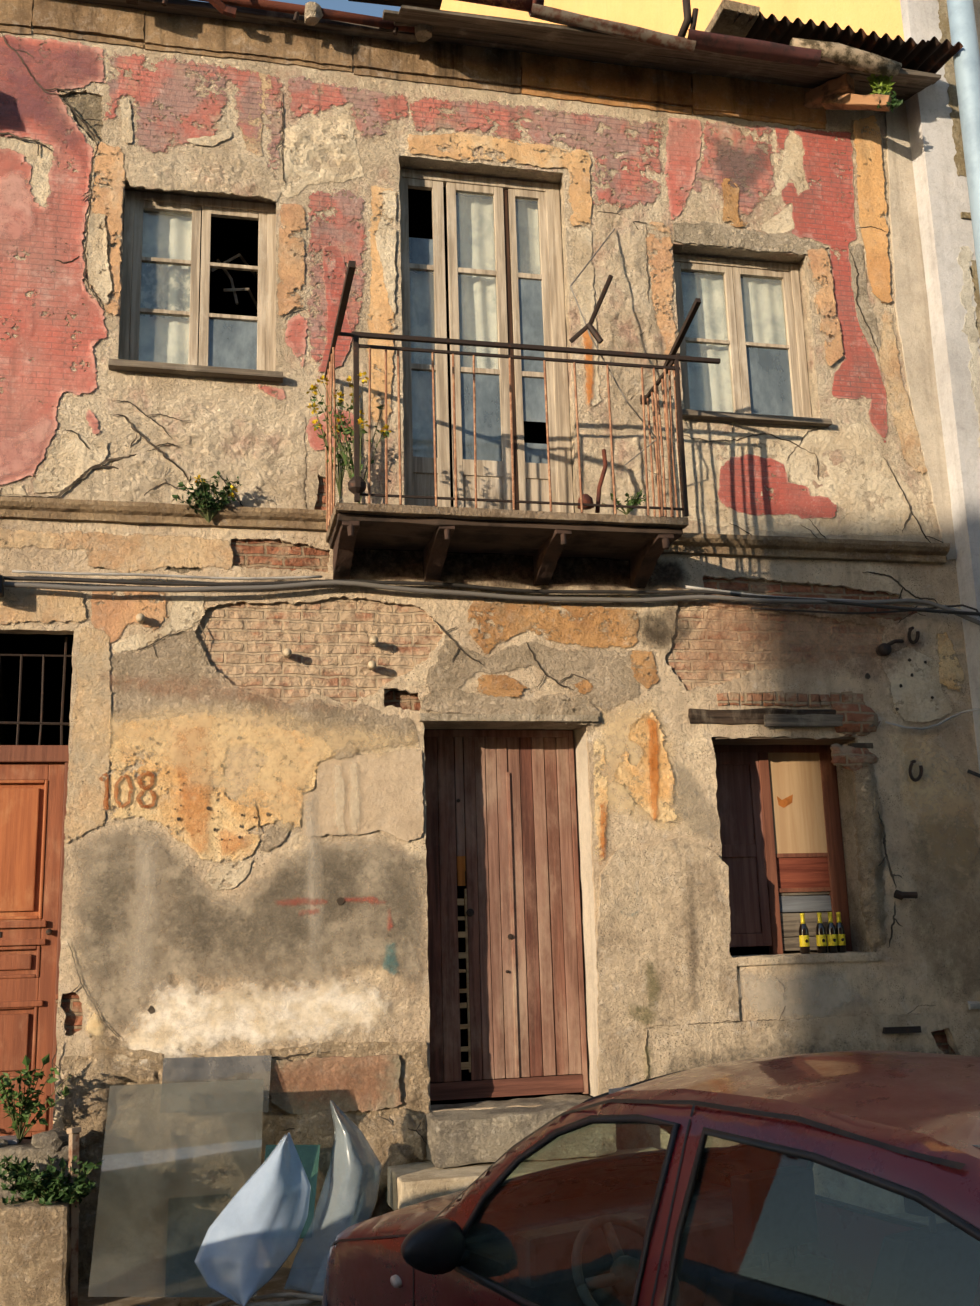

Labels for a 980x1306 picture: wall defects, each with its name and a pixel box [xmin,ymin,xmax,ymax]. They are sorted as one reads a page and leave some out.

flaking render [60,92,104,142]
flaking render [119,98,133,143]
flaking render [0,136,54,207]
flaking render [721,132,809,234]
flaking render [87,213,112,311]
flaking render [849,243,881,351]
crack [0,400,190,501]
flaking render [732,511,756,527]
flaking render [90,566,443,711]
damp [71,764,421,1062]
flaking render [55,992,83,1036]
crack [645,977,794,1080]